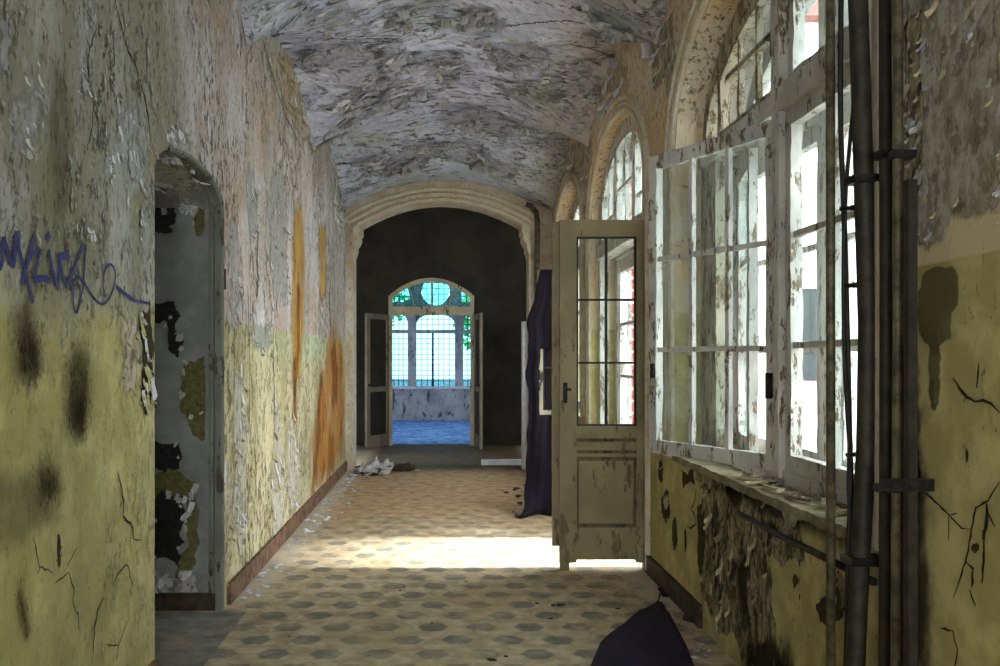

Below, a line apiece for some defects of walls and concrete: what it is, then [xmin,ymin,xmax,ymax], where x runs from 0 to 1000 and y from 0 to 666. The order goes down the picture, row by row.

peeling [903,0,1000,251]
water stain [72,397,87,438]
flaking render [120,301,206,441]
corrosion [293,207,305,424]
corrosion [313,332,344,488]
water stain [918,267,958,410]
crack [952,363,1000,413]
crack [33,537,133,661]
crack [118,474,140,541]
flaking render [155,441,200,593]
flaking render [656,458,804,666]
crack [923,482,1000,606]